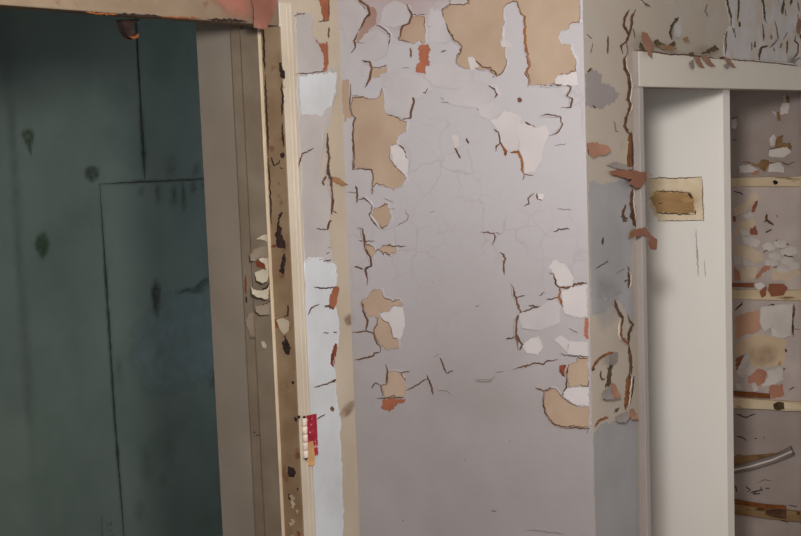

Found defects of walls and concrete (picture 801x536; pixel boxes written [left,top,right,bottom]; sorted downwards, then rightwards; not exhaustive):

peeling [380,0,431,74]
crack [341,0,474,103]
peeling [441,0,583,88]
peeling [689,0,801,70]
leakage [87,22,214,533]
peeling [246,246,270,348]
peeling [294,0,415,536]
crack [355,198,409,285]
peeling [584,162,637,339]
peeling [648,176,705,222]
peeling [734,302,800,339]
peeling [536,356,640,536]